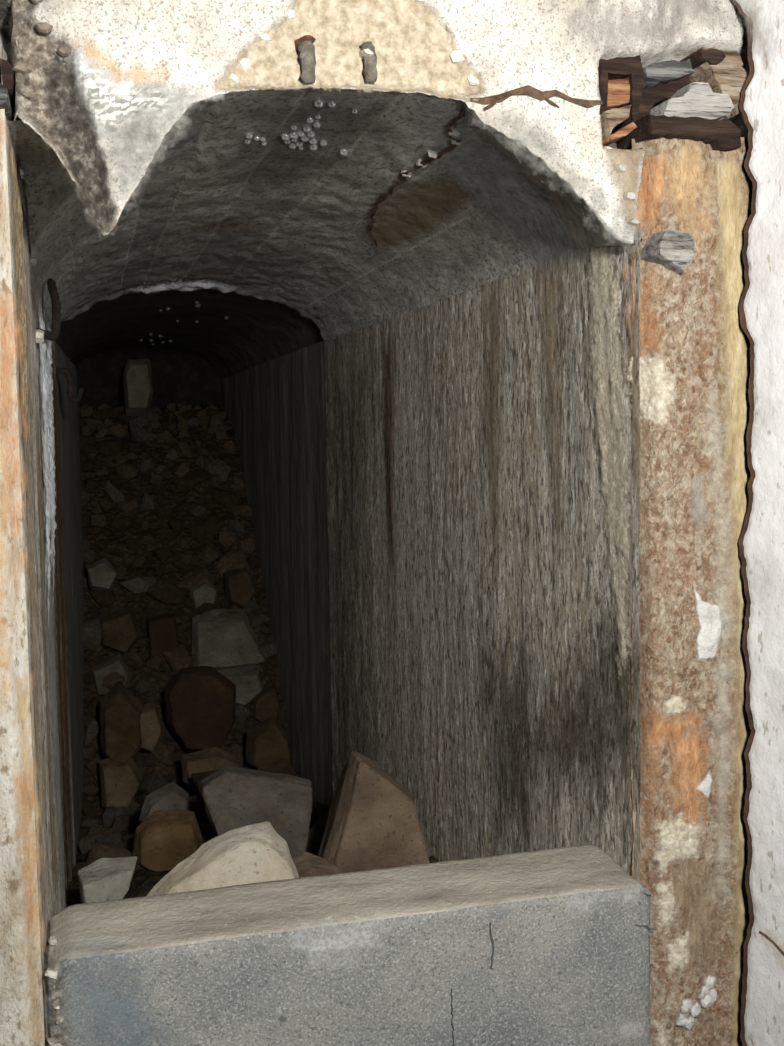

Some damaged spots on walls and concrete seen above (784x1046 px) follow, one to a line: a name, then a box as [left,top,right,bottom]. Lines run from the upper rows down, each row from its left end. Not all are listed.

spalling [0,0,116,232]
crack [454,85,603,129]
spalling [17,156,37,267]
corrosion [639,150,700,228]
corrosion [717,160,751,1046]
corrosion [646,712,706,826]
crack [488,923,496,968]
efflorescence [651,812,705,972]
crack [759,931,784,960]
efflorescence [652,976,717,1046]